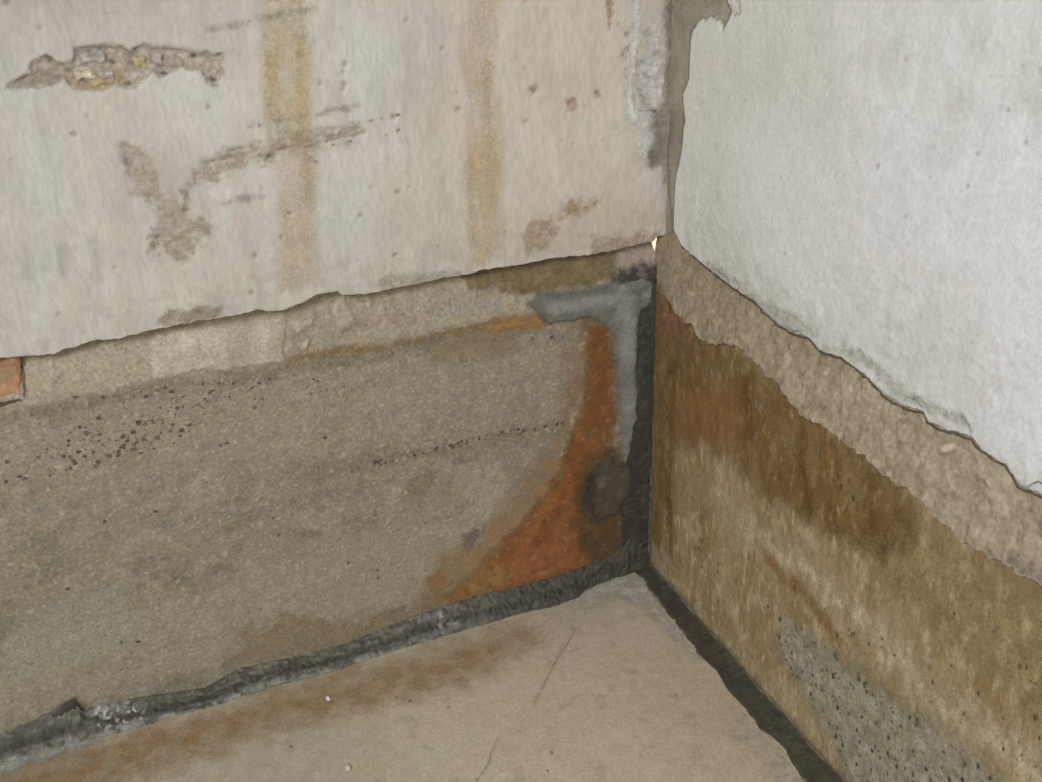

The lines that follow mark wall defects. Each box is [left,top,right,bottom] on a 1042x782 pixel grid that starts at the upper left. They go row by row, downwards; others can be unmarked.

spalling [9,45,224,90]
peeling [648,0,740,237]
rust [482,315,545,333]
rust [424,322,622,613]
leakage [652,291,1042,723]
spalling [823,349,969,428]
rust [3,630,535,782]
leakage [722,488,1042,782]
spalling [778,617,992,782]